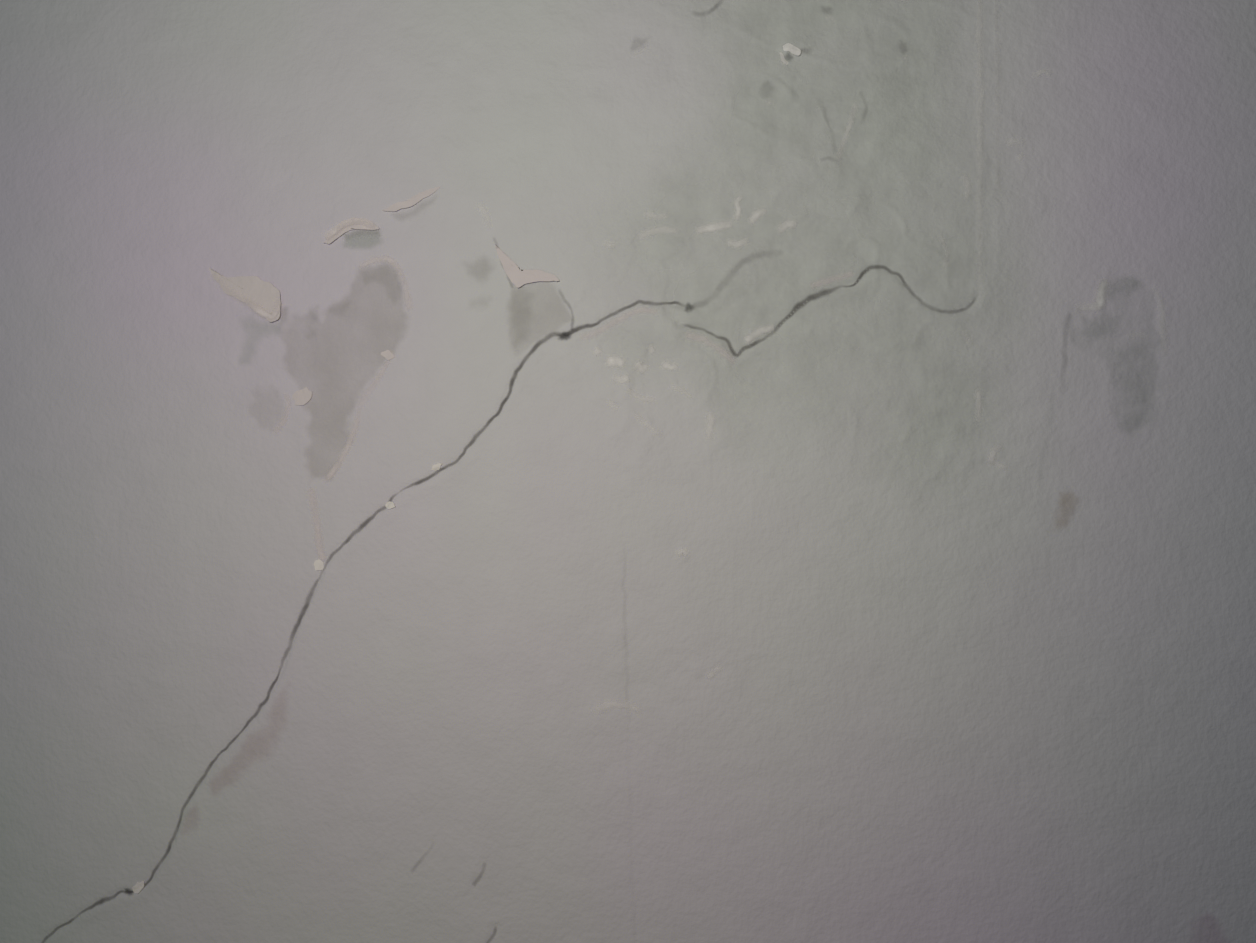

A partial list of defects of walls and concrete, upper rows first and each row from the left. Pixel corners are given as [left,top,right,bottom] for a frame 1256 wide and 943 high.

crack [470,324,597,445]
crack [746,326,773,346]
crack [314,463,444,571]
crack [98,881,145,903]